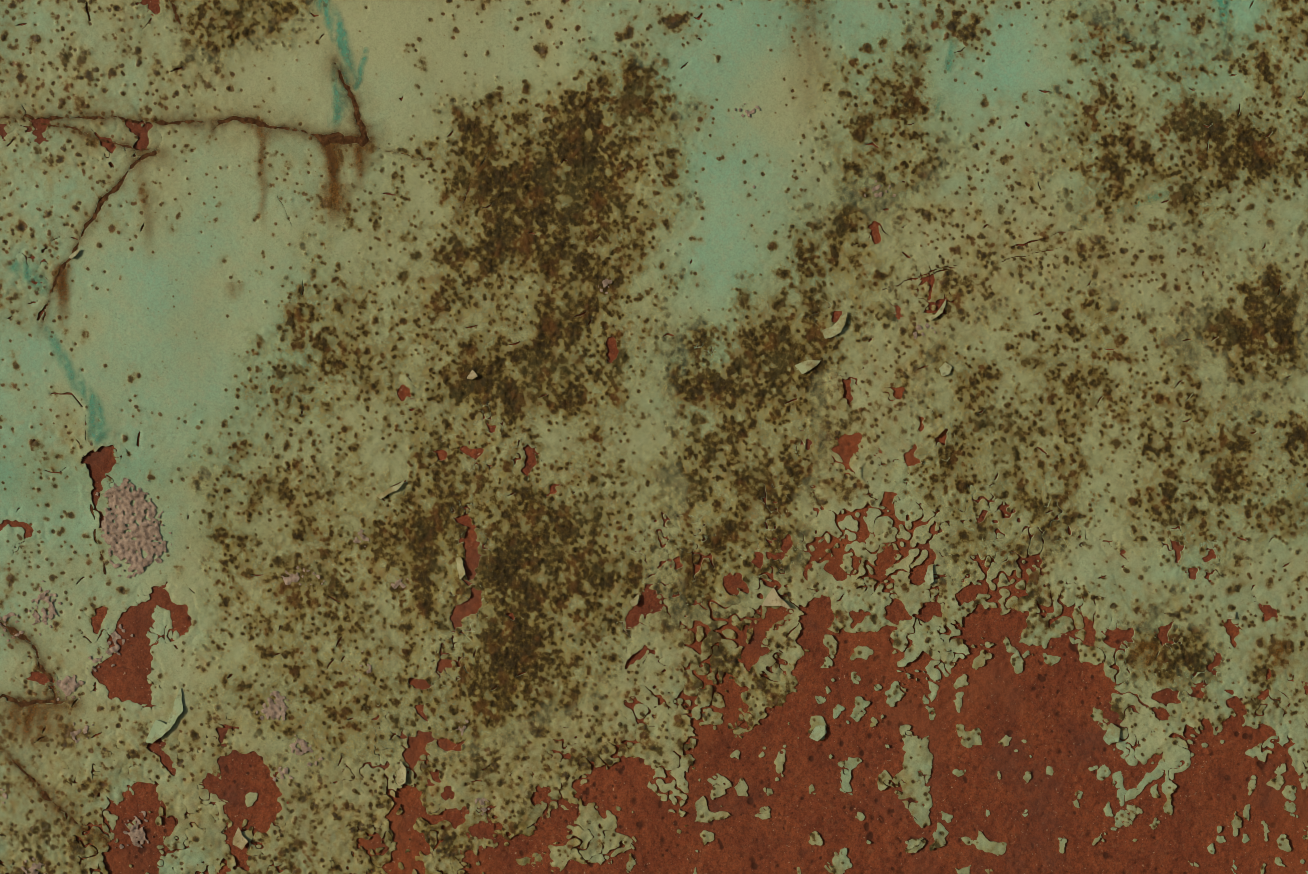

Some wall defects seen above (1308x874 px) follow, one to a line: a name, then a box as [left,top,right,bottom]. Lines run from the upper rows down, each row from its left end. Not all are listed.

rust [1038,0,1308,242]
rust [187,22,971,771]
peeling [903,416,948,467]
rust [879,255,1308,594]
peeling [0,519,34,542]
peeling [26,668,55,688]
peeling [88,583,192,776]
peeling [352,491,1308,874]
rust [1111,609,1225,702]
peeling [97,781,175,874]
peeling [201,724,289,874]